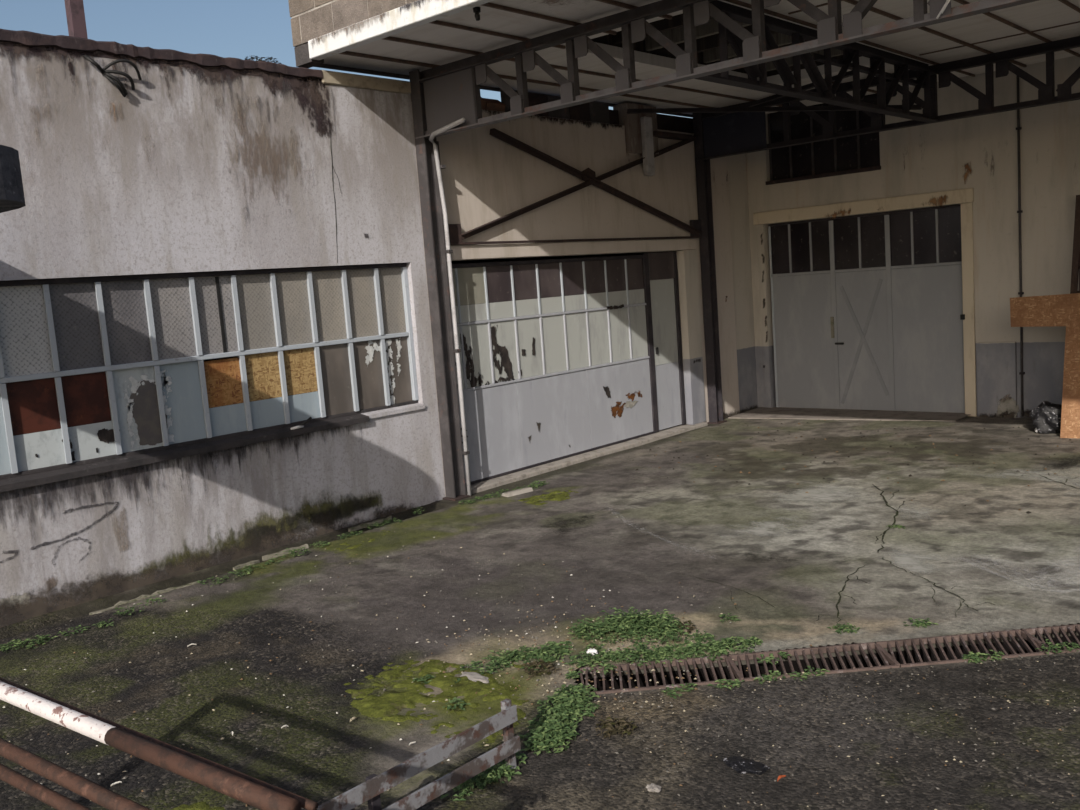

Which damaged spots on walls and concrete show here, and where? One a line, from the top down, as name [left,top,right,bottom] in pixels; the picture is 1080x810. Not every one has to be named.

damp [0,42,335,136]
damp [233,106,301,191]
peeling [96,370,174,453]
peeling [365,337,402,405]
peeling [455,326,535,388]
corrosion [603,386,642,418]
damp [0,425,349,520]
damp [0,494,414,628]
crack [816,485,1013,624]